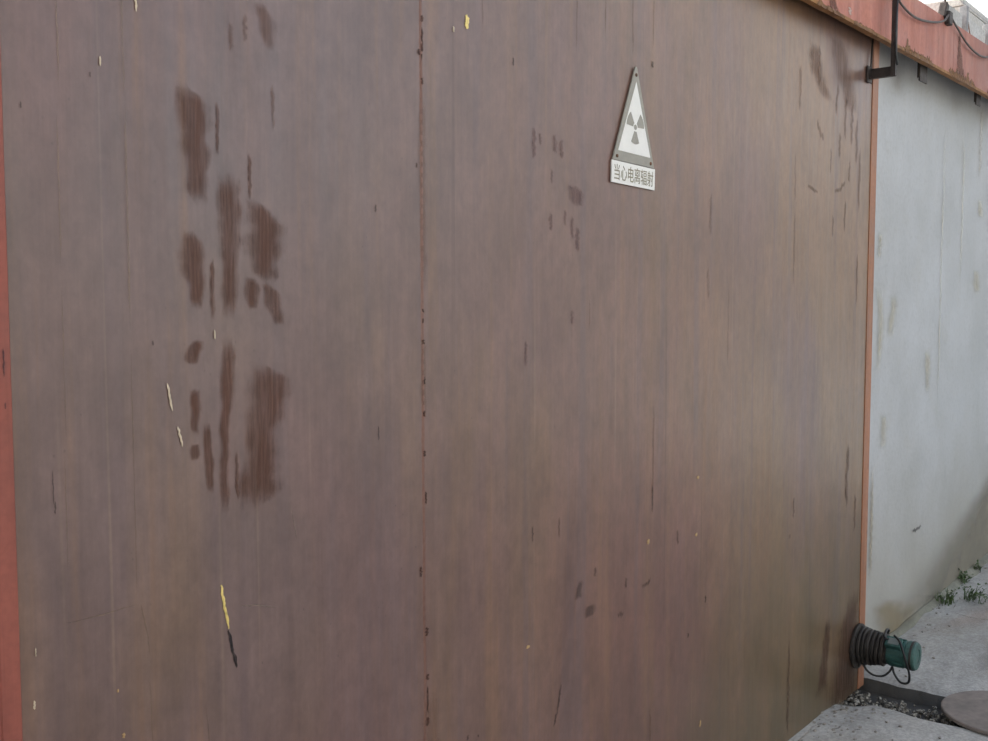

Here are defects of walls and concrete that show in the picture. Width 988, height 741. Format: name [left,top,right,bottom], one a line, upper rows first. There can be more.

corrosion [181,97,219,192]
corrosion [187,186,239,308]
corrosion [249,208,281,320]
corrosion [192,350,283,495]
peeling [221,585,229,629]